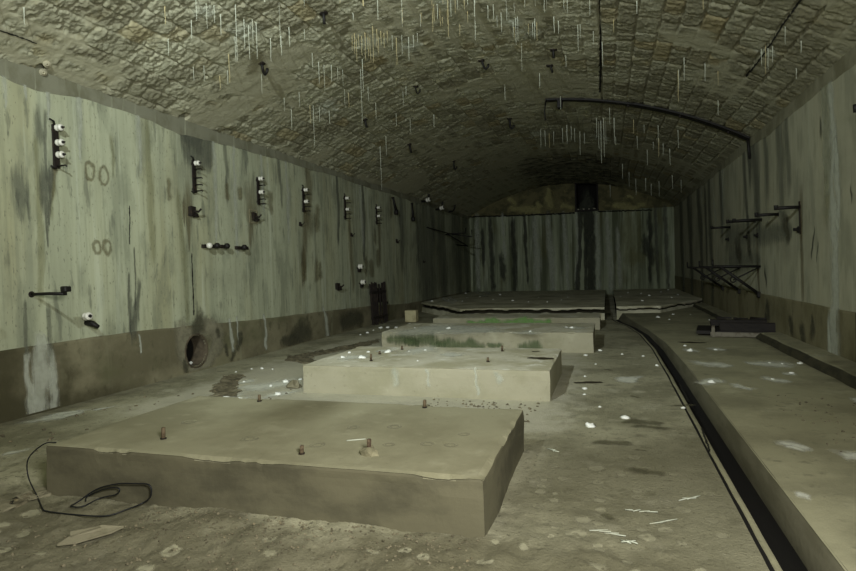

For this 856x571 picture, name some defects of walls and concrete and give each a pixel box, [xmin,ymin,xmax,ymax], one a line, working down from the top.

leakage [181,135,213,173]
leakage [40,170,53,246]
leakage [476,214,529,297]
leakage [575,191,596,290]
leakage [822,83,840,355]